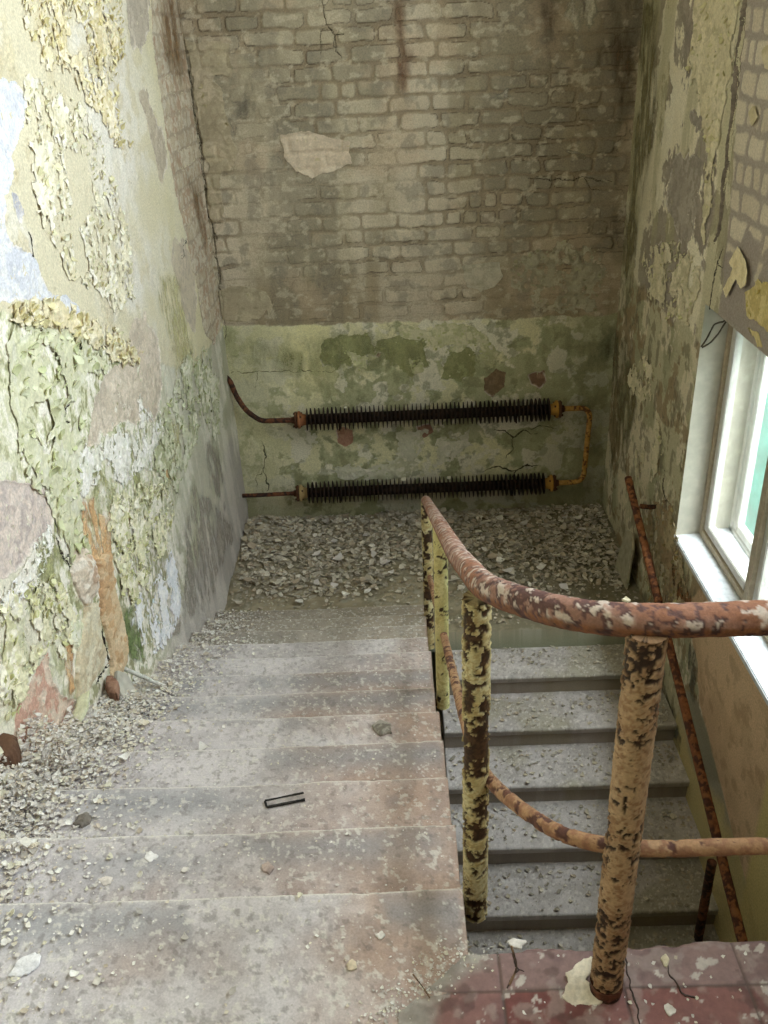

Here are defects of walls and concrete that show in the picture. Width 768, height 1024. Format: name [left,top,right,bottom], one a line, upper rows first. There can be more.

crack [186,58,221,290]
flaking render [280,131,352,178]
peeling [641,0,740,327]
peeling [723,246,768,347]
peeling [0,0,272,758]
peeling [627,354,655,406]
crack [255,445,270,491]
crack [483,425,554,479]